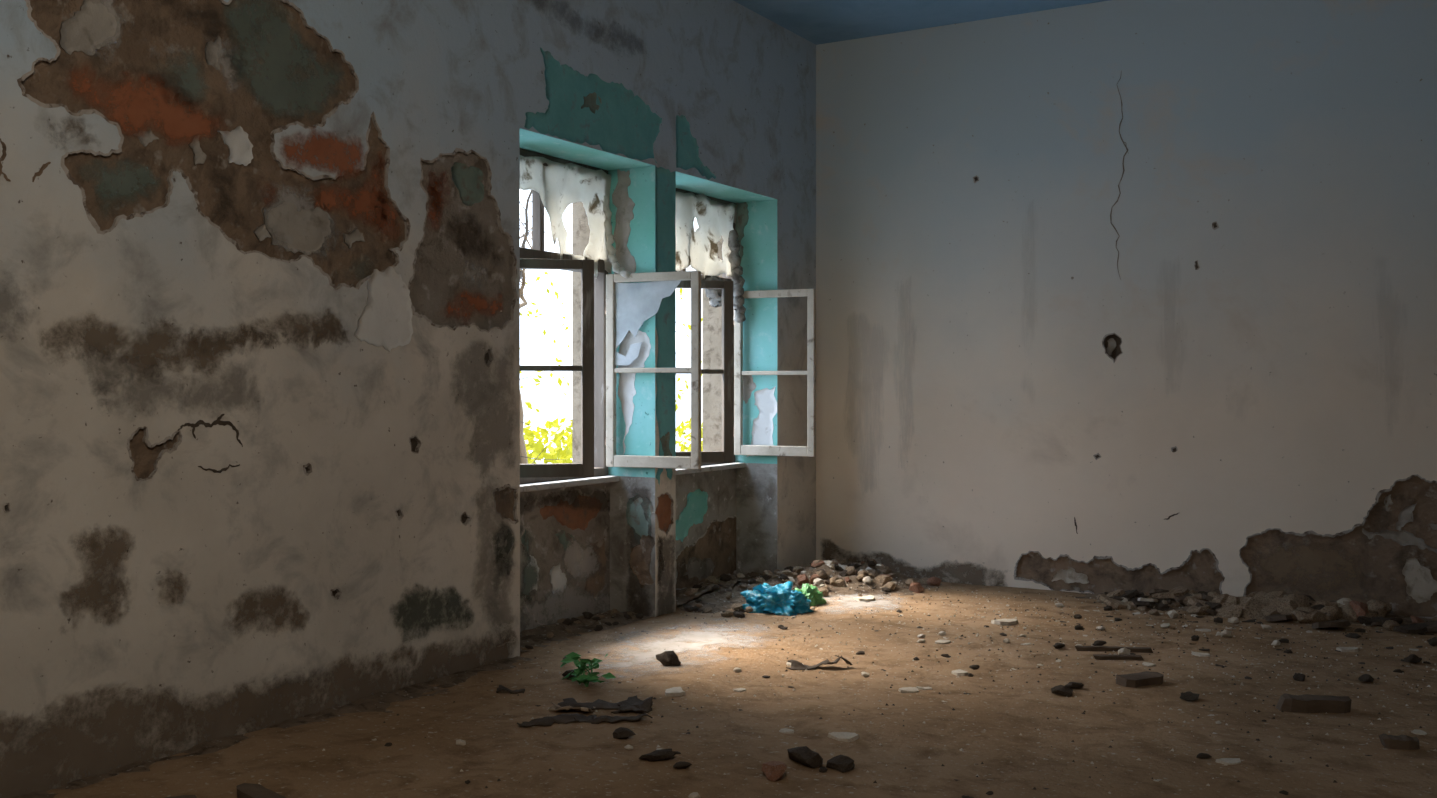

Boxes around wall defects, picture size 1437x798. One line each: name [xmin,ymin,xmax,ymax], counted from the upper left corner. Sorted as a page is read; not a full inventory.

flaking render [17,0,518,367]
peeling [524,48,716,274]
crack [1110,71,1129,280]
crack [178,414,243,473]
flaking render [493,289,737,625]
flaking render [1102,333,1123,363]
flaking render [1013,548,1225,595]
flaking render [1239,474,1437,619]